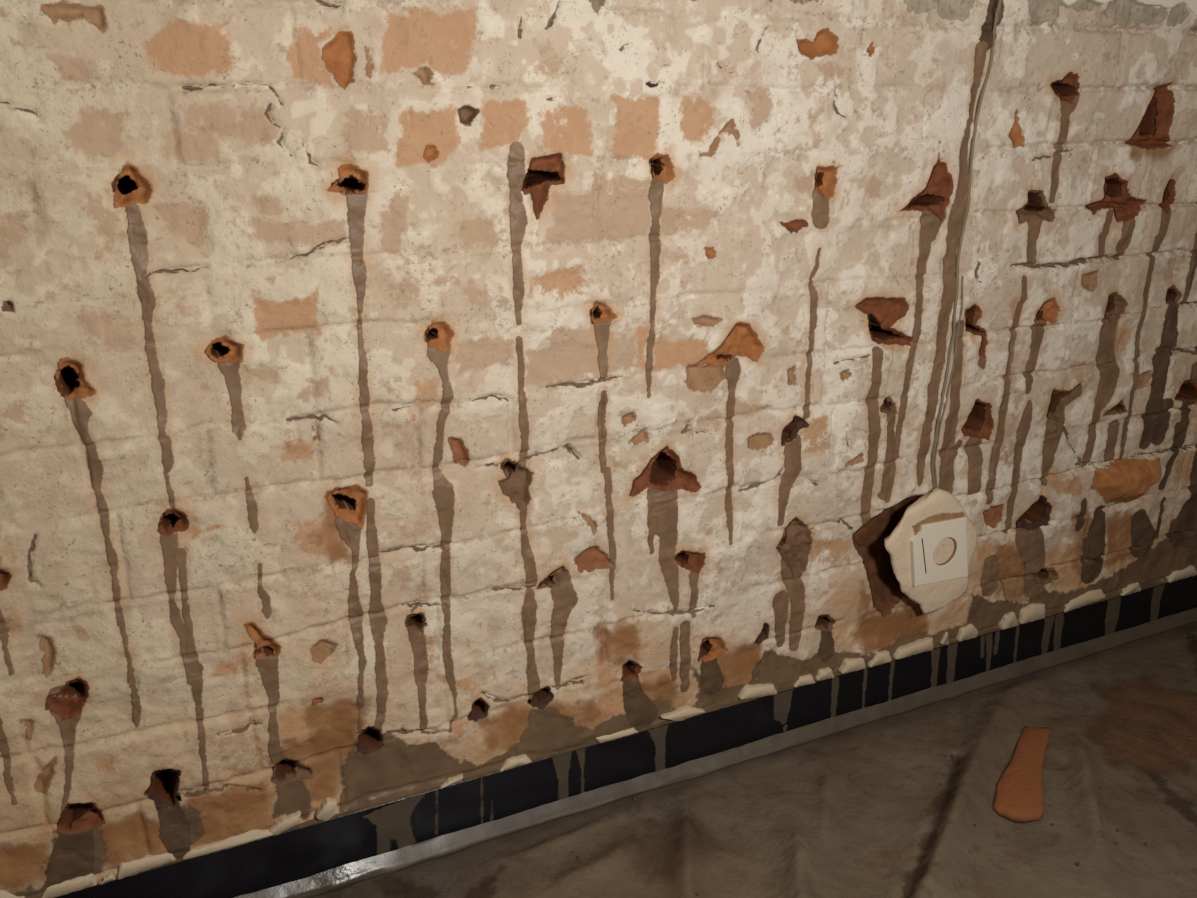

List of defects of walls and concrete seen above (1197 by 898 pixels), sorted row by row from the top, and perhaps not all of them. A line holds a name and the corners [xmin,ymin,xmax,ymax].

spalling [41,0,108,33]
spalling [1028,0,1197,32]
crack [0,102,38,117]
spalling [1126,82,1175,149]
spalling [524,153,565,219]
leakage [126,203,175,508]
spalling [685,315,764,393]
spalling [856,297,913,346]
leakage [256,0,1197,855]
spalling [630,446,702,497]
leakage [245,477,259,533]
spalling [853,495,924,617]